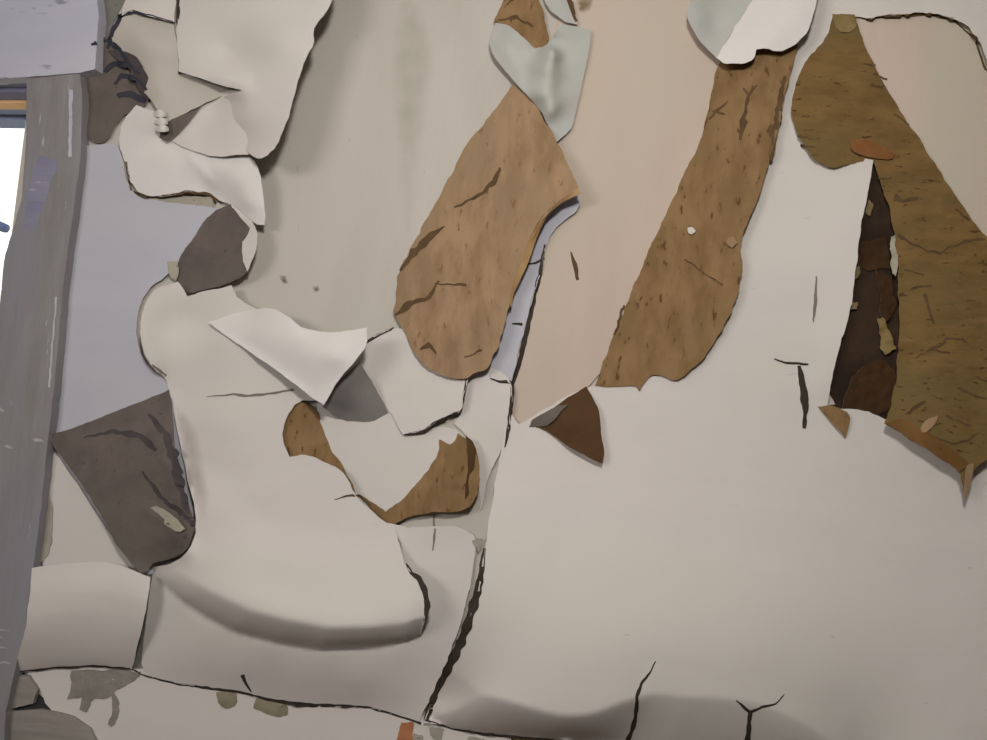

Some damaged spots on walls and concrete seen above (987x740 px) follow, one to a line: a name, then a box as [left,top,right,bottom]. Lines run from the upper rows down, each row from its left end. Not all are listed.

crack [106,0,180,49]
crack [866,13,987,71]
peeling [17,0,591,740]
peeling [429,0,987,740]
crack [20,548,556,740]
crack [625,661,656,740]
crack [736,694,785,740]